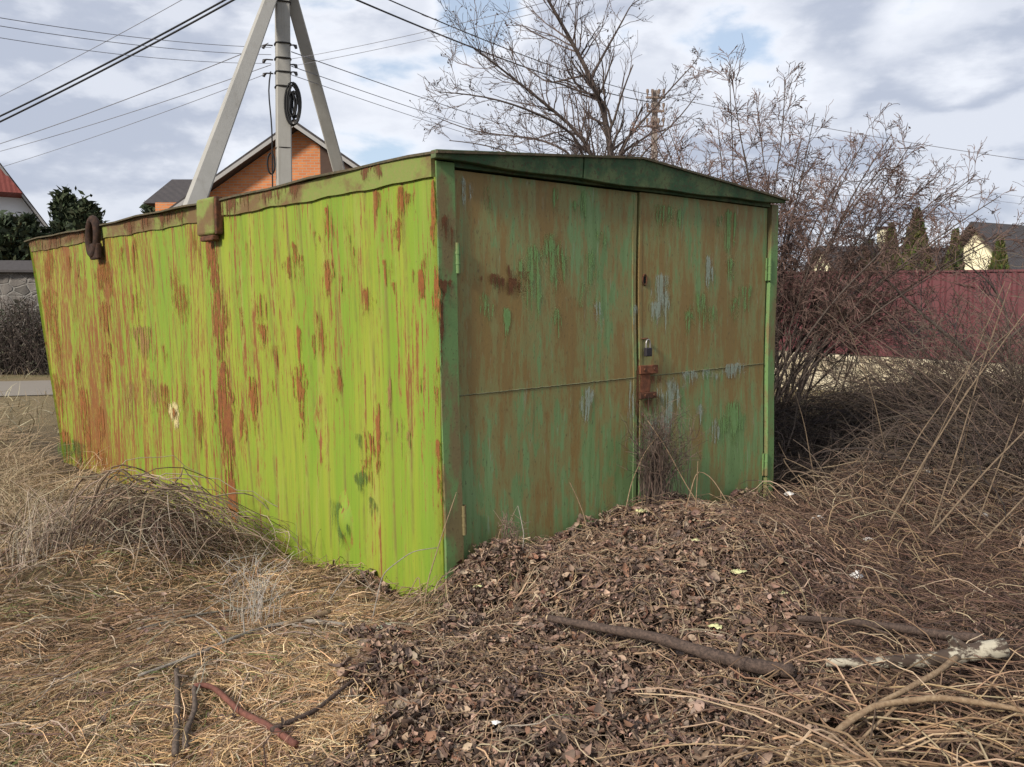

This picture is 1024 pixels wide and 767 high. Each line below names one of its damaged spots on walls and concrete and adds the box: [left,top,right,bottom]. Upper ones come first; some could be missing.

rust [221,183,301,218]
rust [375,186,416,246]
rust [430,179,453,247]
rust [322,234,355,297]
rust [412,257,452,402]
peeling [651,272,670,331]
rust [29,211,280,522]
rust [292,310,327,438]
peeling [168,403,179,428]
rust [360,379,410,477]